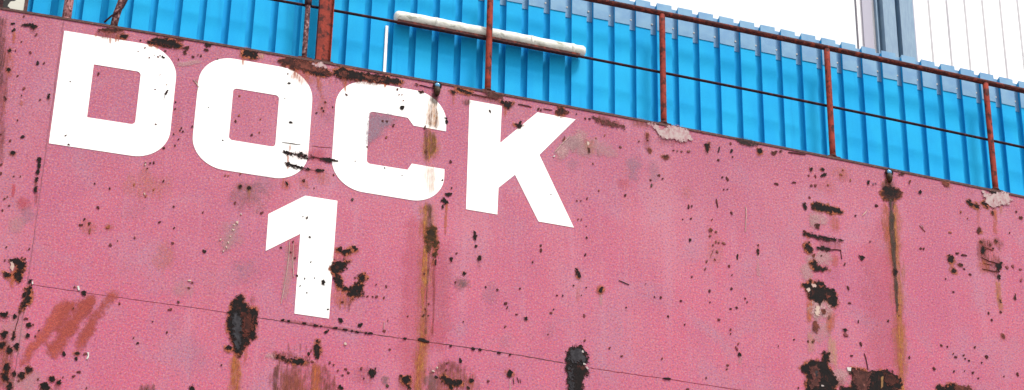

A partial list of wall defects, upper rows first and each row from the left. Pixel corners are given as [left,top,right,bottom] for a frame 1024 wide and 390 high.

corrosion [95,27,129,43]
corrosion [240,49,263,62]
peeling [638,122,733,161]
peeling [960,188,1023,234]
corrosion [414,205,474,390]
corrosion [880,181,904,390]
corrosion [980,239,1023,303]